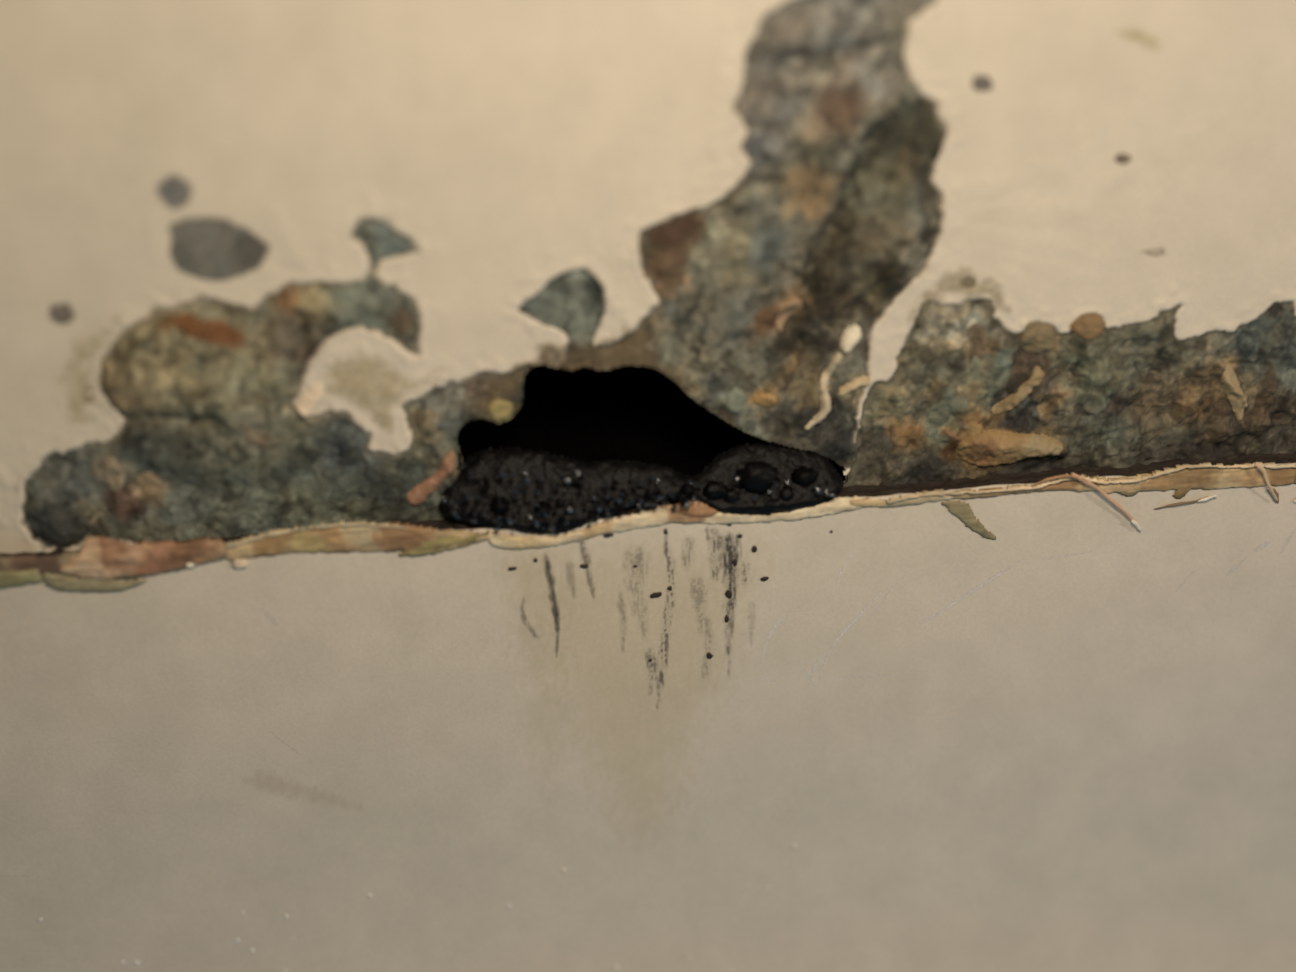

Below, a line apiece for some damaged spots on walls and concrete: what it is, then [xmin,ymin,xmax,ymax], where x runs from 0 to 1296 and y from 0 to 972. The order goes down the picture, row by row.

peeling [0,0,1296,593]
water stain [476,333,698,419]
water stain [546,560,559,632]
water stain [714,536,738,628]